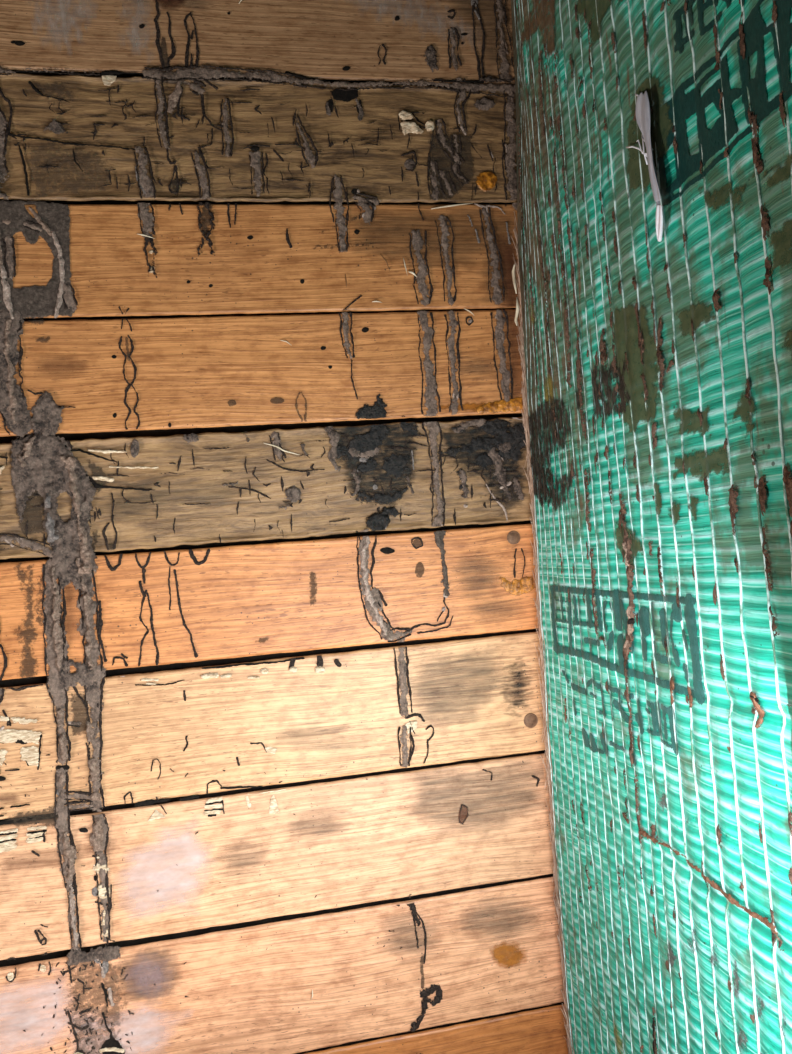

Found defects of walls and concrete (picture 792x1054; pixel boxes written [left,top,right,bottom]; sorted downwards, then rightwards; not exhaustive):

leakage [589,360,630,421]
leakage [323,394,421,505]
leakage [438,381,580,520]
peeling [0,703,42,781]
peeling [0,826,47,857]